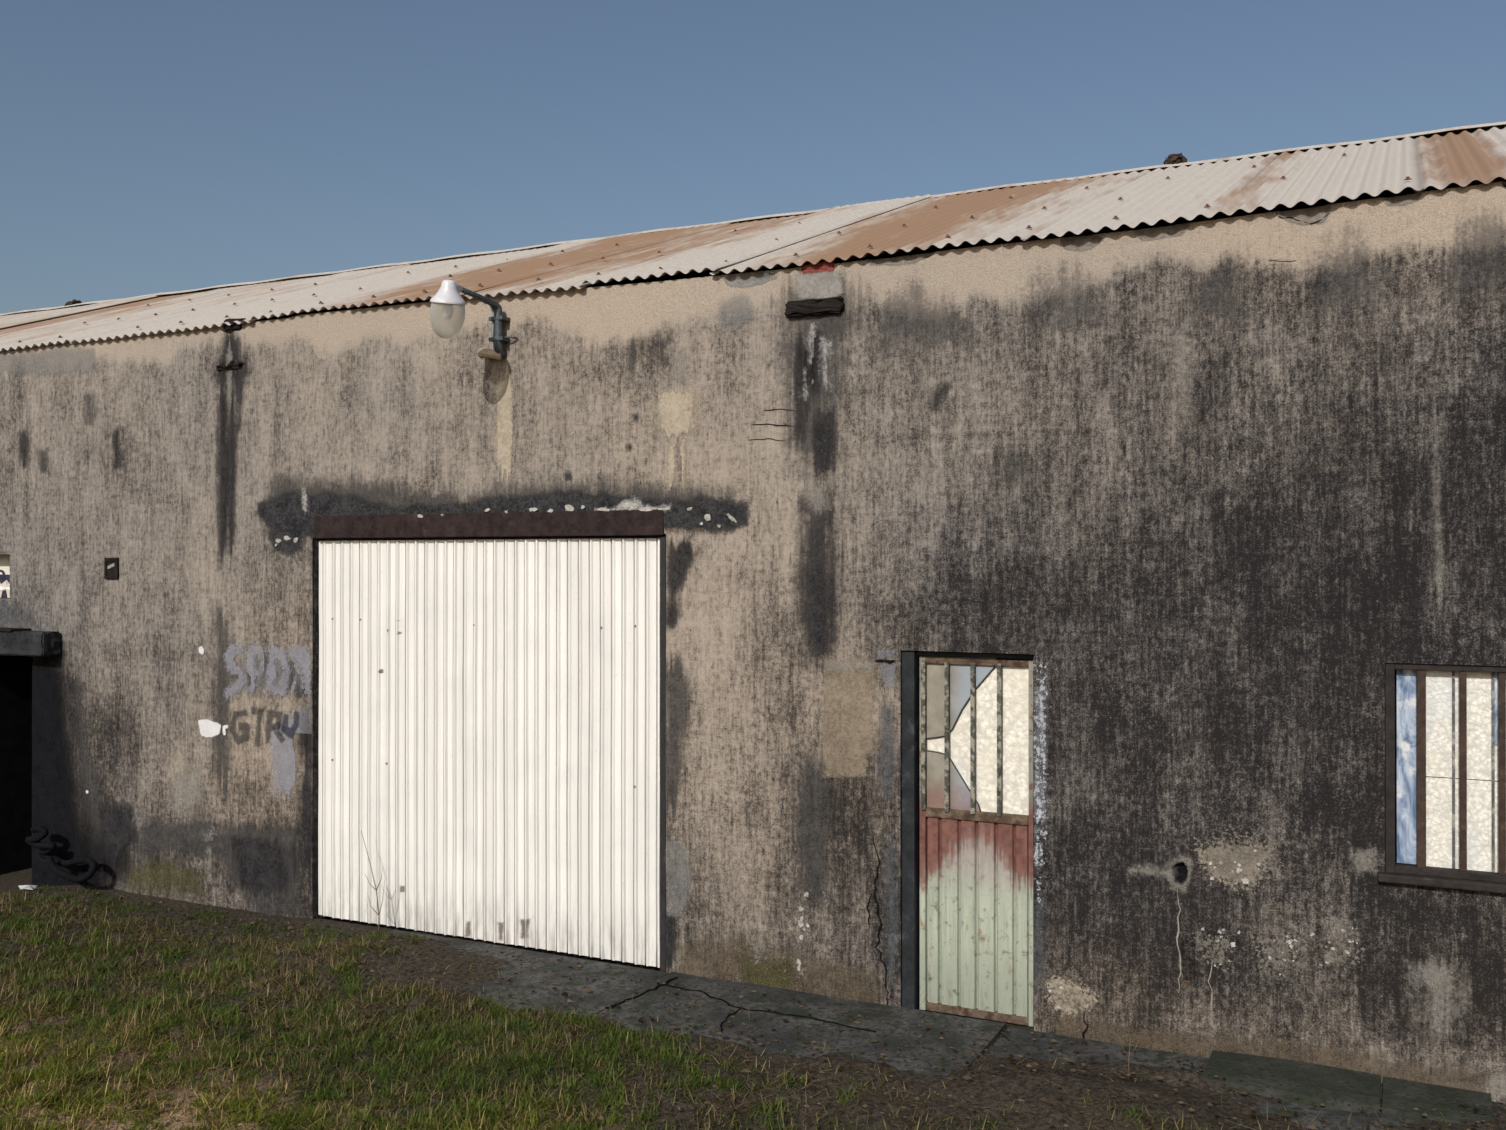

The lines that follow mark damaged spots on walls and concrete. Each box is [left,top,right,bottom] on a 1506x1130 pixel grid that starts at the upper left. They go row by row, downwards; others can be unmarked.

damp [213,331,251,563]
damp [257,364,749,628]
damp [783,284,854,475]
damp [796,492,843,665]
damp [212,608,229,796]
damp [665,657,689,821]
damp [666,913,676,967]
crack [605,839,888,1032]
flaking render [1042,973,1100,1017]
crack [1176,888,1213,1019]
flaking render [1183,824,1295,901]